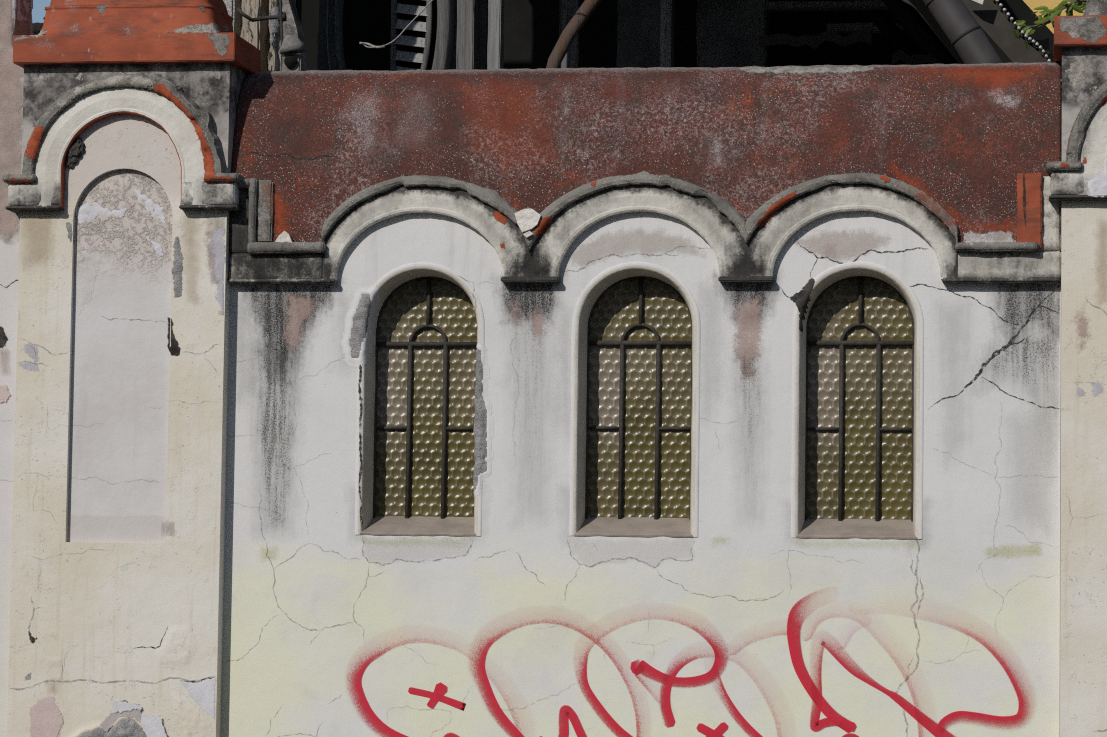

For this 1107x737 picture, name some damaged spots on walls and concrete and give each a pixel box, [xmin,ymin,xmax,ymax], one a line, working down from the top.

peeling [166,5,231,56]
spalling [269,7,280,46]
peeling [1059,14,1107,43]
peeling [739,66,874,75]
peeling [757,190,796,228]
crack [798,242,927,277]
damp [724,241,777,475]
crack [910,284,1060,409]
damp [236,254,333,528]
spalling [341,284,383,528]
spalling [473,343,493,497]
spalling [29,696,168,737]